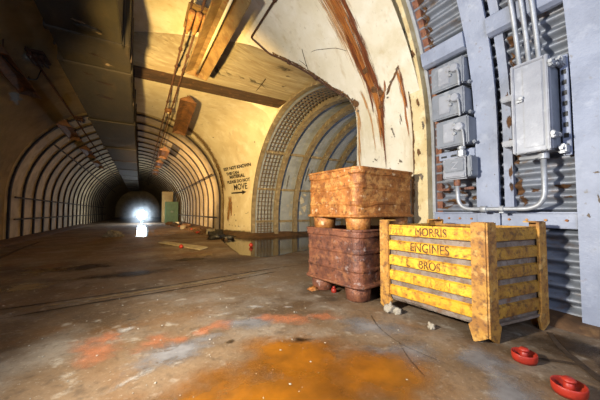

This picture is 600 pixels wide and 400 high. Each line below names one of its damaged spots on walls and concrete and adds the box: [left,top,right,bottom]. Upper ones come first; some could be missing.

rust [322,0,386,166]
rust [397,68,409,135]
rust [509,155,540,206]